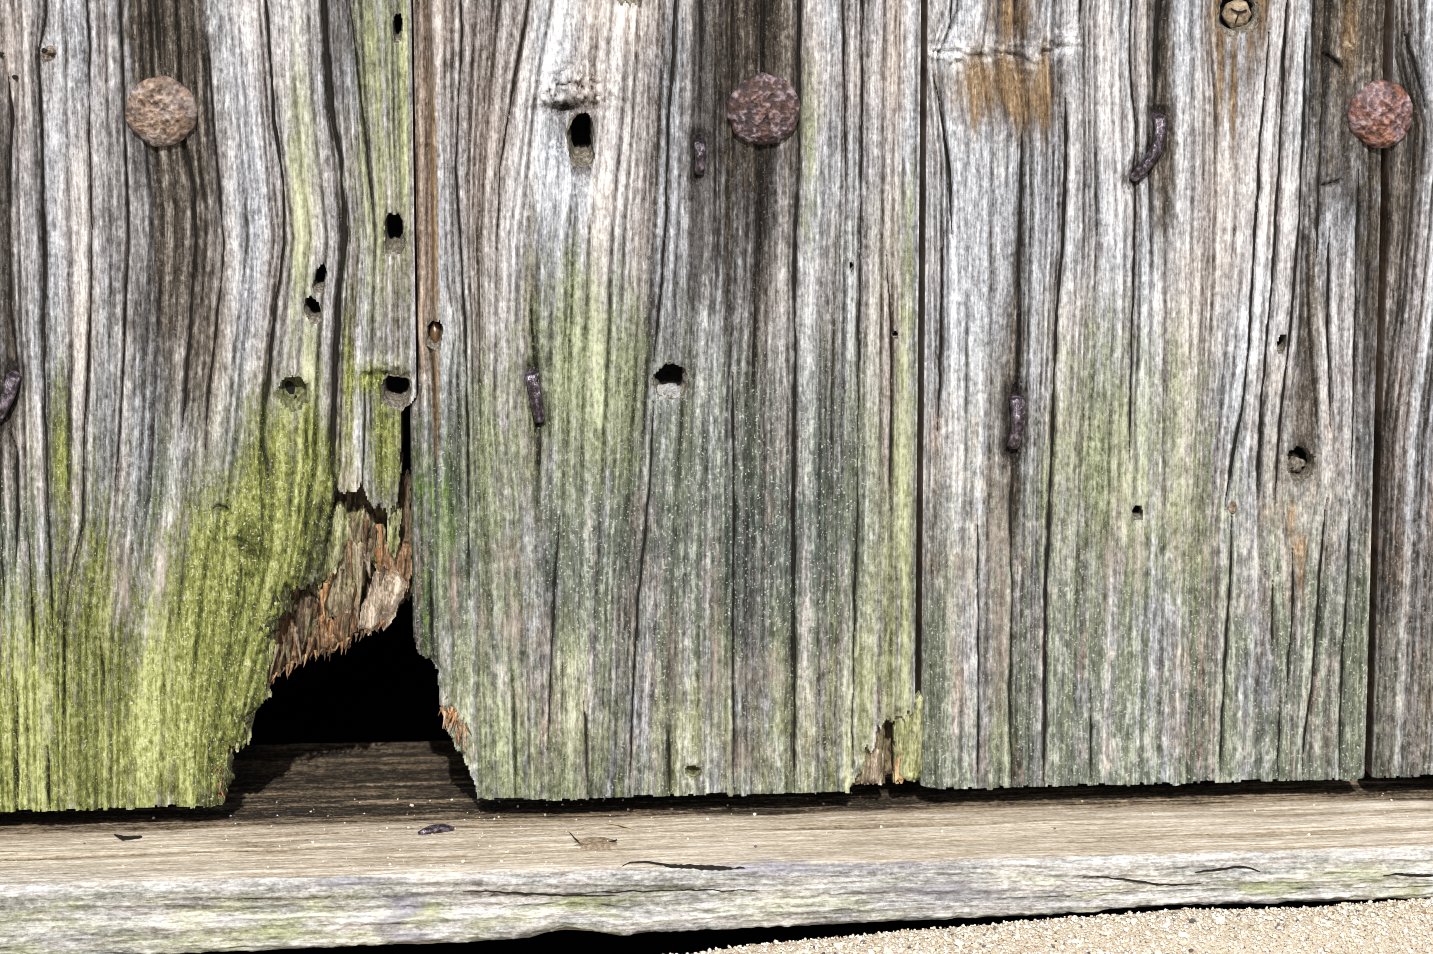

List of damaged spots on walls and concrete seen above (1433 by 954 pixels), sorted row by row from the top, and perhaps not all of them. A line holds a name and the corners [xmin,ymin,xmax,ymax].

rust [0,83,21,462]
rust [113,0,224,396]
spalling [209,469,412,808]
peeling [449,559,458,625]
peeling [503,605,531,653]
rust [519,199,540,481]
rust [690,0,806,292]
spalling [849,690,923,788]
rust [989,232,1025,691]
rust [1149,0,1177,236]
rust [1311,0,1424,549]